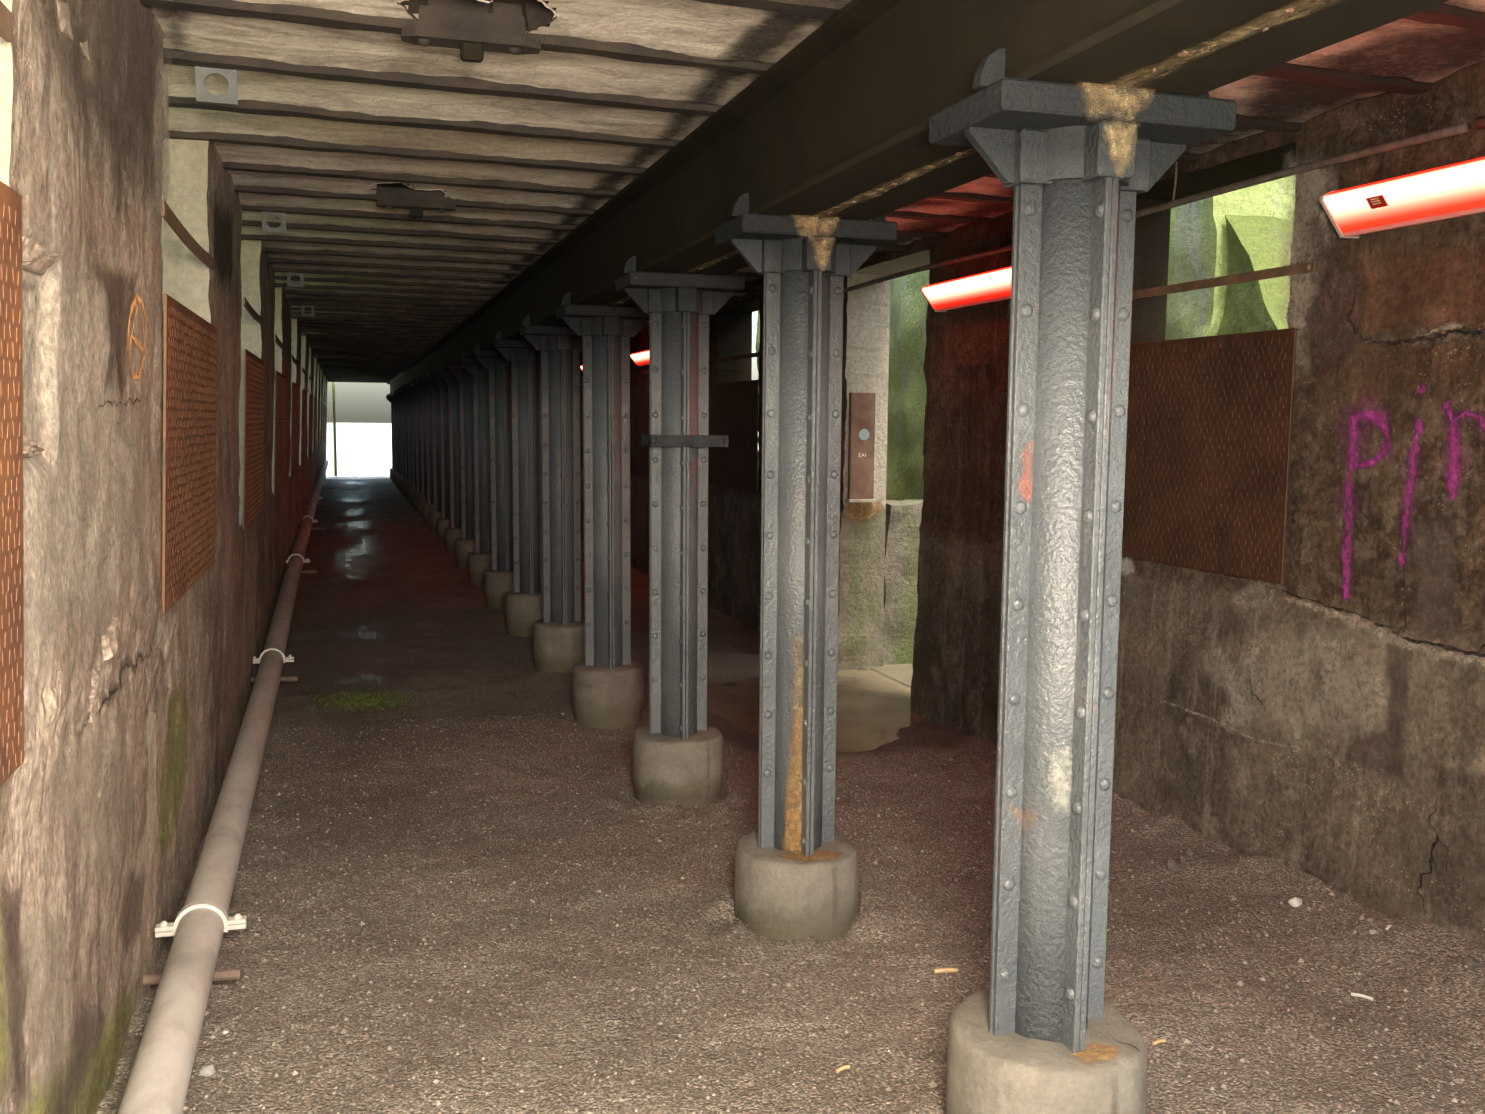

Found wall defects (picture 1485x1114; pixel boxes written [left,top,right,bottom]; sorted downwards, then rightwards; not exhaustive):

crack [79,618,153,745]
rust [780,661,840,862]
crack [1417,802,1449,912]
rust [1073,1044,1118,1062]